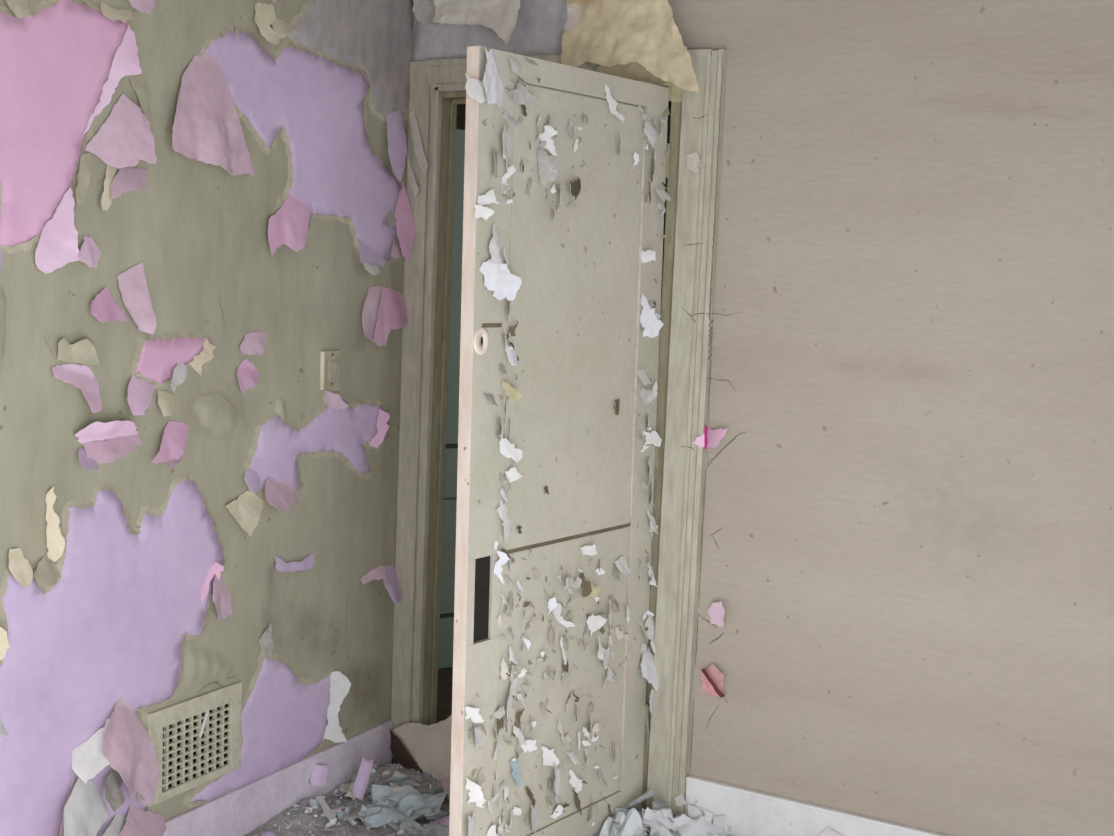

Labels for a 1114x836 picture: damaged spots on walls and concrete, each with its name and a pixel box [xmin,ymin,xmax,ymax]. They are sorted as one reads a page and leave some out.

peeling [0,0,128,247]
peeling [135,337,211,384]
peeling [190,0,671,836]
peeling [0,479,225,836]